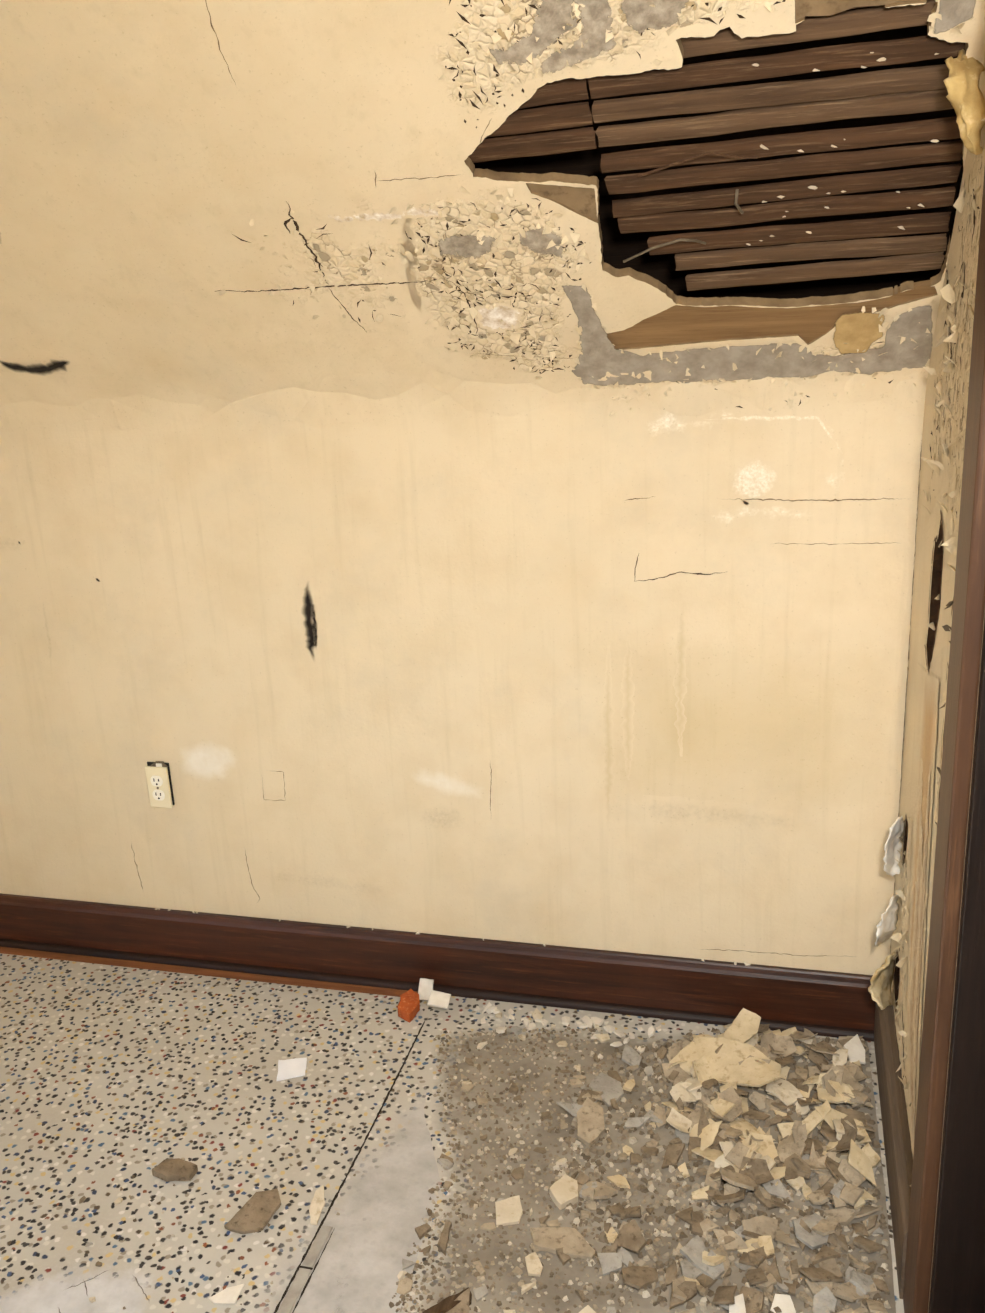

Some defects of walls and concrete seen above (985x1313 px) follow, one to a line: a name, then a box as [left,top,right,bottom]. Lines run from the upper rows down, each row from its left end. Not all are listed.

crack [218,204,508,356]
peeling [221,0,985,571]
peeling [868,810,913,1154]